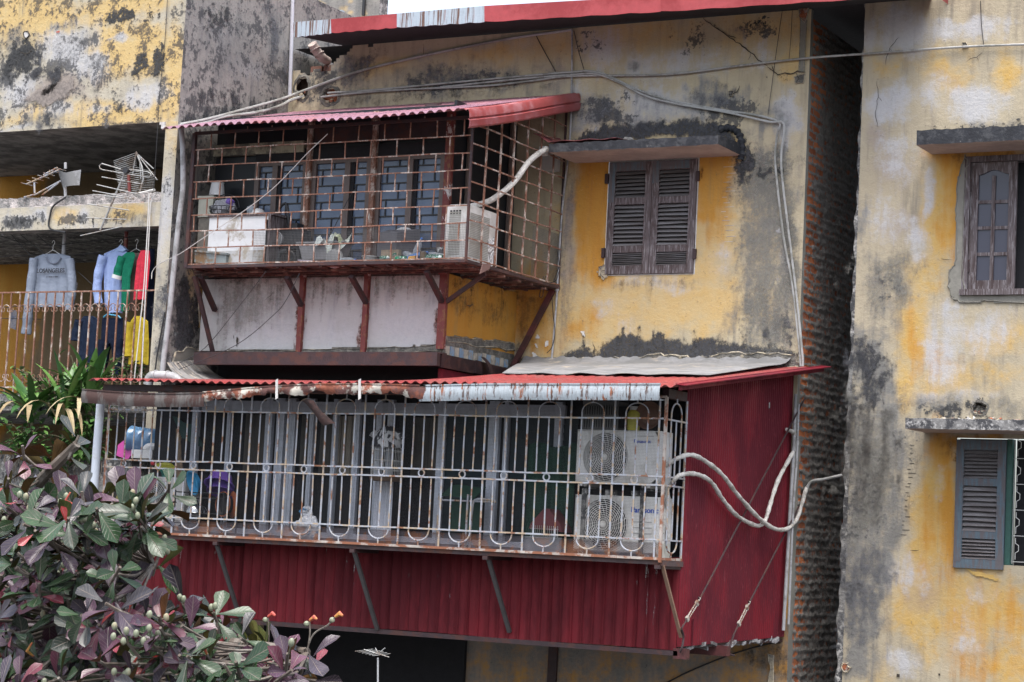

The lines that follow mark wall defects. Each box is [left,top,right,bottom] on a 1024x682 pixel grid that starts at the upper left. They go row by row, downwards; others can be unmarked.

damp [0,36,109,95]
damp [105,6,160,38]
damp [131,42,166,77]
damp [181,3,288,123]
crack [702,16,802,81]
damp [565,90,801,365]
damp [923,398,989,419]
damp [841,334,898,644]